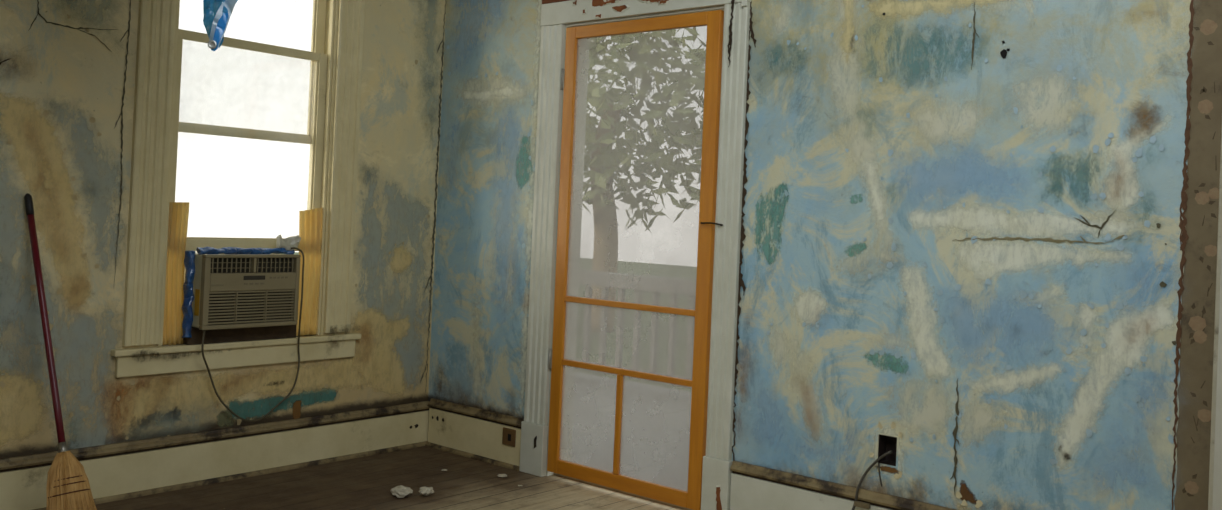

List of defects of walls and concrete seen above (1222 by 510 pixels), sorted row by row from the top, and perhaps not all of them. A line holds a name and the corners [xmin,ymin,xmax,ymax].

peeling [572,0,669,19]
crack [971,2,979,70]
crack [28,0,131,281]
crack [952,210,1125,244]
crack [950,379,960,493]
flaking render [956,480,983,508]